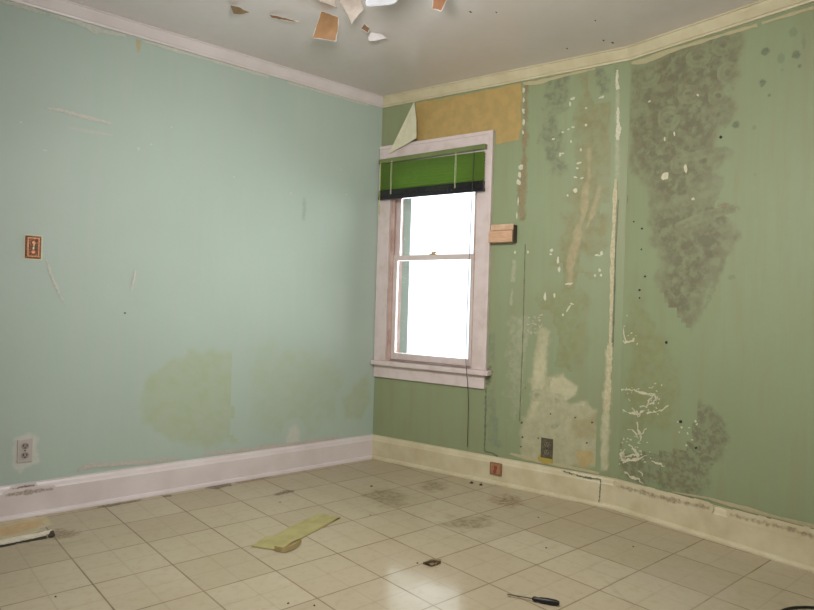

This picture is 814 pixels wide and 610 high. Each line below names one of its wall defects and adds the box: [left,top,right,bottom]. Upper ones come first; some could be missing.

peeling [231,5,250,15]
peeling [313,0,386,41]
peeling [416,68,595,145]
water stain [523,23,809,381]
flaking render [513,314,597,466]
water stain [613,367,738,514]
water stain [726,509,814,543]